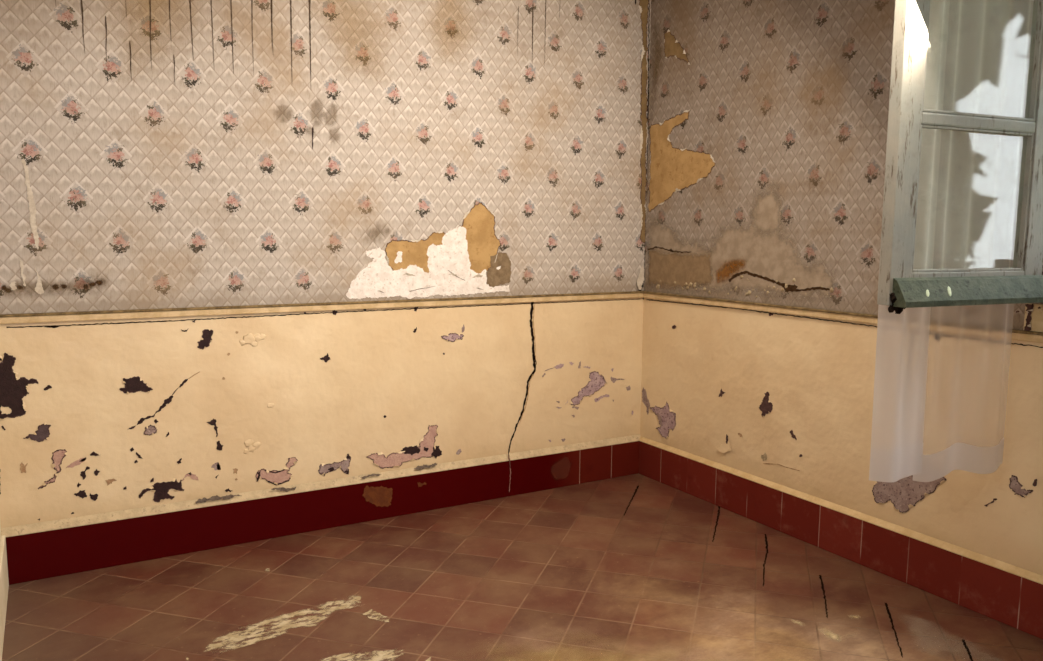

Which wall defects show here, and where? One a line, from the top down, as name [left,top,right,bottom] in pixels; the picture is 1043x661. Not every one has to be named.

crack [644,5,652,192]
flaking render [346,211,510,311]
peeling [0,353,52,430]
peeling [119,376,153,394]
crack [7,222,877,491]
crack [929,333,1043,348]
peeling [23,423,127,501]
peeling [139,458,198,502]
peeling [318,425,442,507]
crack [712,506,720,542]
crack [761,534,769,586]
crack [819,575,828,618]